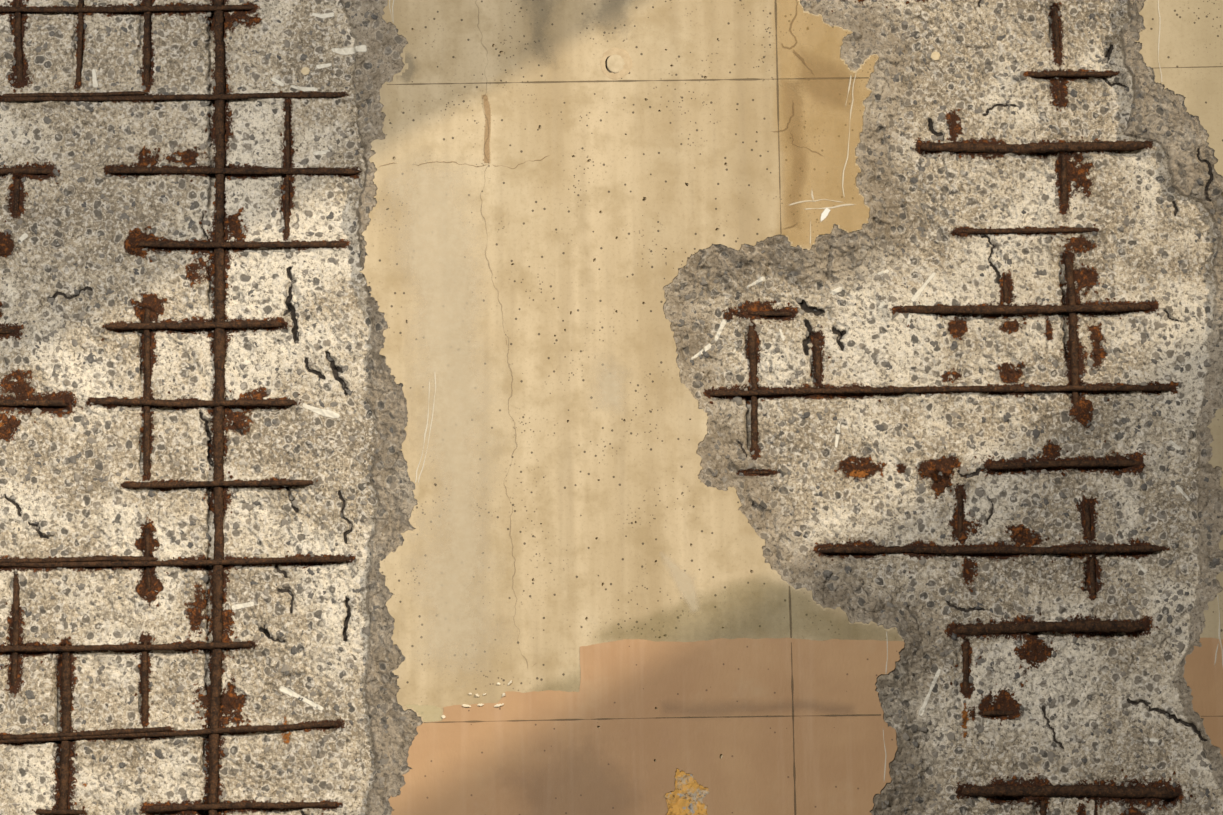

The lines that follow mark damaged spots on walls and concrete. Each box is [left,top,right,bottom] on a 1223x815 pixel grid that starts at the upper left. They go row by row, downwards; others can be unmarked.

rust [182,207,248,288]
rust [1058,234,1105,297]
rust [130,292,167,331]
rust [1085,315,1107,371]
rust [0,369,41,442]
spalling [0,0,423,815]
spalling [663,0,1223,815]
rust [834,455,968,499]
rust [135,570,164,607]
rust [185,576,238,659]
rust [191,674,251,735]
rust [961,632,1057,740]